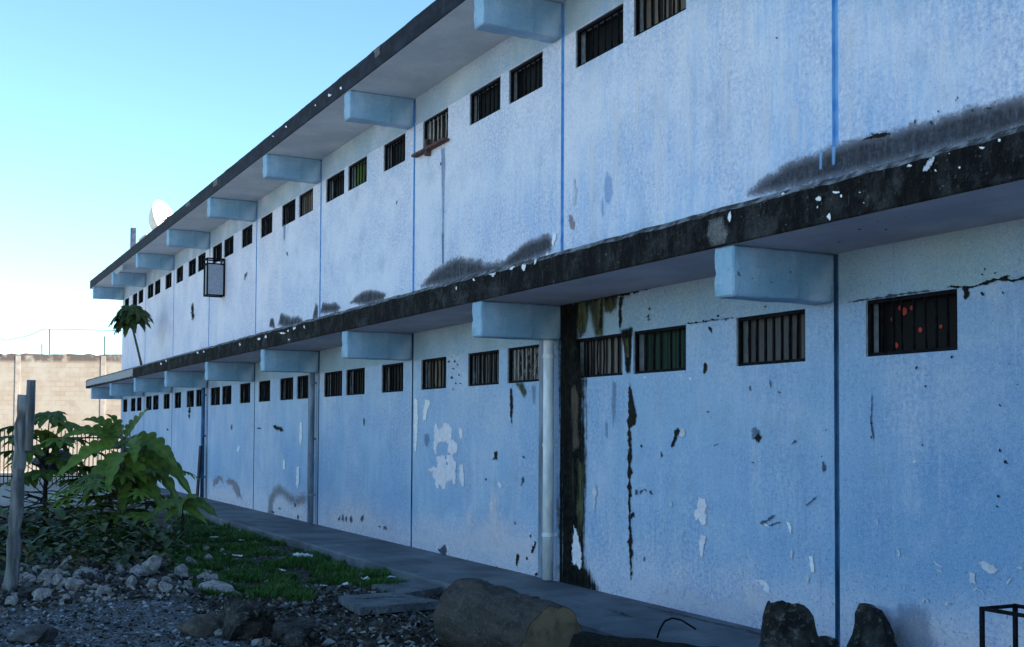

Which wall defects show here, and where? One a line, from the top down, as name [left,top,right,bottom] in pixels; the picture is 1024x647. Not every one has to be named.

damp [748,95,1024,196]
mould [270,290,386,328]
damp [421,232,557,287]
crack [848,268,1024,303]
peeling [413,398,464,490]
damp [557,289,648,590]
damp [212,476,249,506]
damp [268,487,305,520]
peeling [694,497,707,559]
peeling [969,560,1022,596]